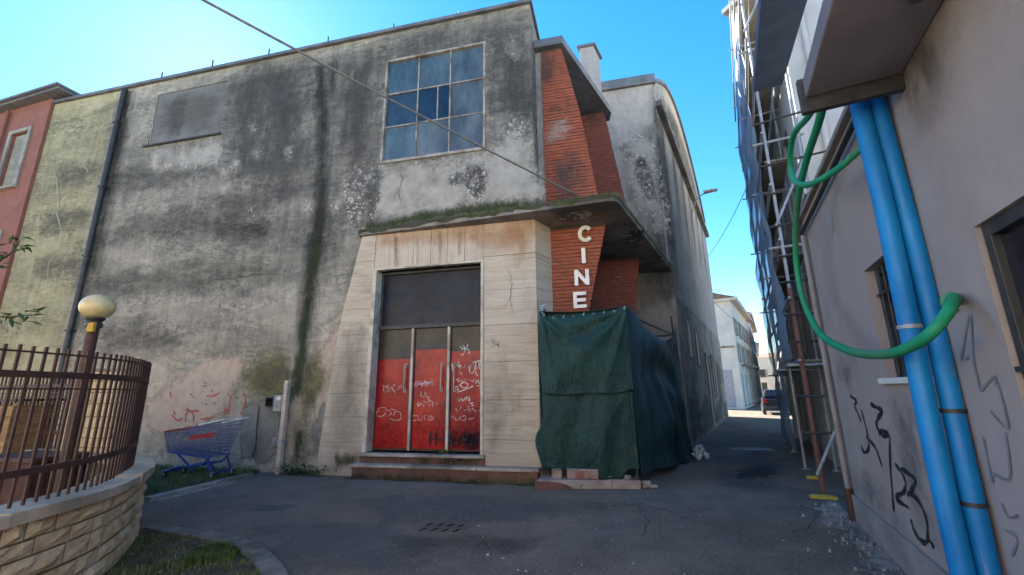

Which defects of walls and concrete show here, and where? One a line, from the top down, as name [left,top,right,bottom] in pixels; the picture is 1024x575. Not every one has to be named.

water stain [102,96,185,224]
water stain [292,66,334,396]
spalling [449,159,496,207]